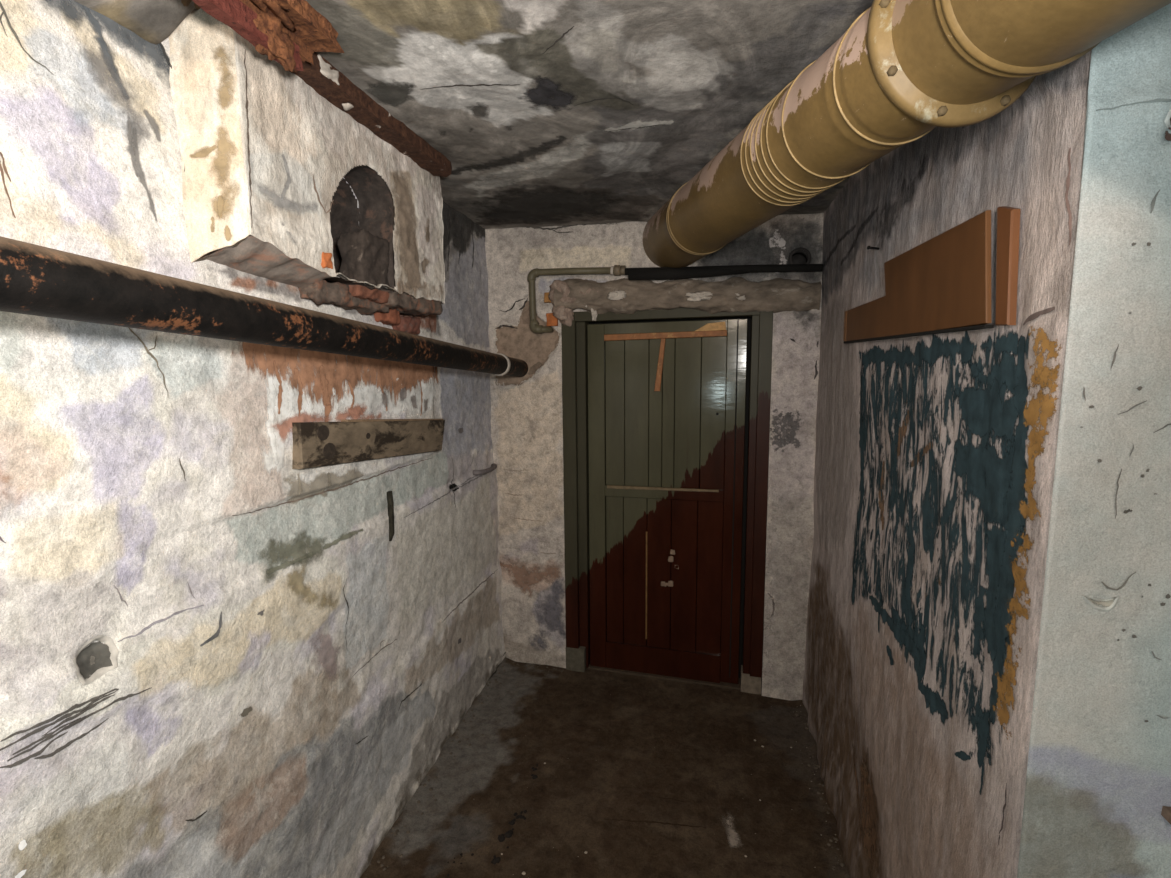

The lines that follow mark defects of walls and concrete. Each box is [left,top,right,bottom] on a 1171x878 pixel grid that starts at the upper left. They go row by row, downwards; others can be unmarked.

rust [251,0,298,74]
damp [369,82,414,107]
damp [524,77,575,109]
crack [1096,99,1171,111]
crack [0,152,16,218]
damp [394,174,430,291]
damp [447,136,624,271]
spalling [493,292,561,389]
rust [232,342,438,439]
crack [1115,423,1171,519]
peeling [849,325,1061,795]
hole [73,635,119,685]